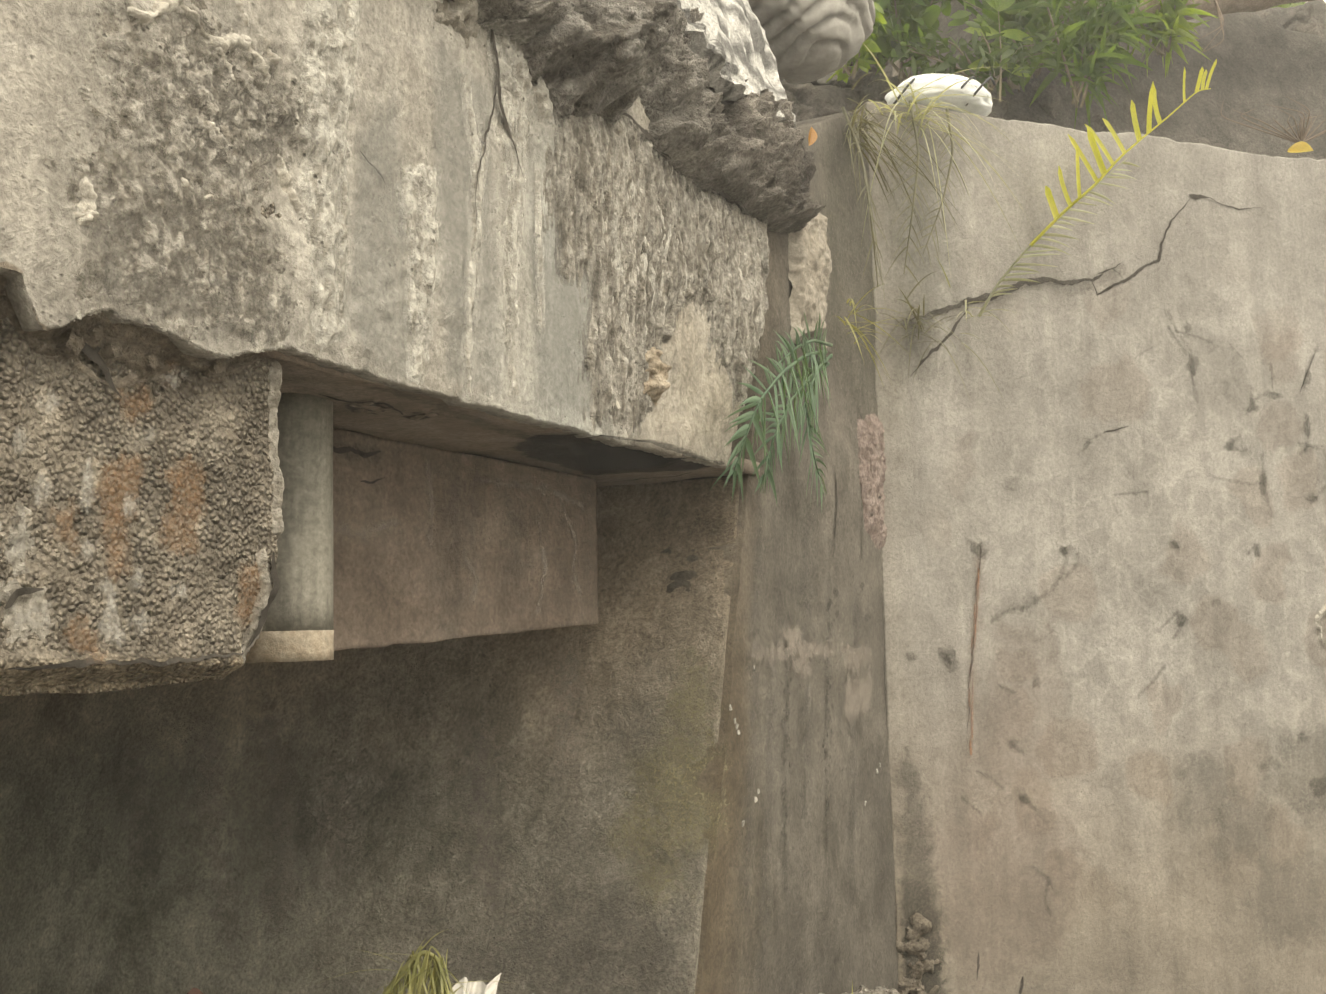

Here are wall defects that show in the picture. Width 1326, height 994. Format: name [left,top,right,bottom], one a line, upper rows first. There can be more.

crack [451,0,524,220]
peeling [542,113,770,446]
crack [910,194,1260,377]
corrosion [967,546,981,755]